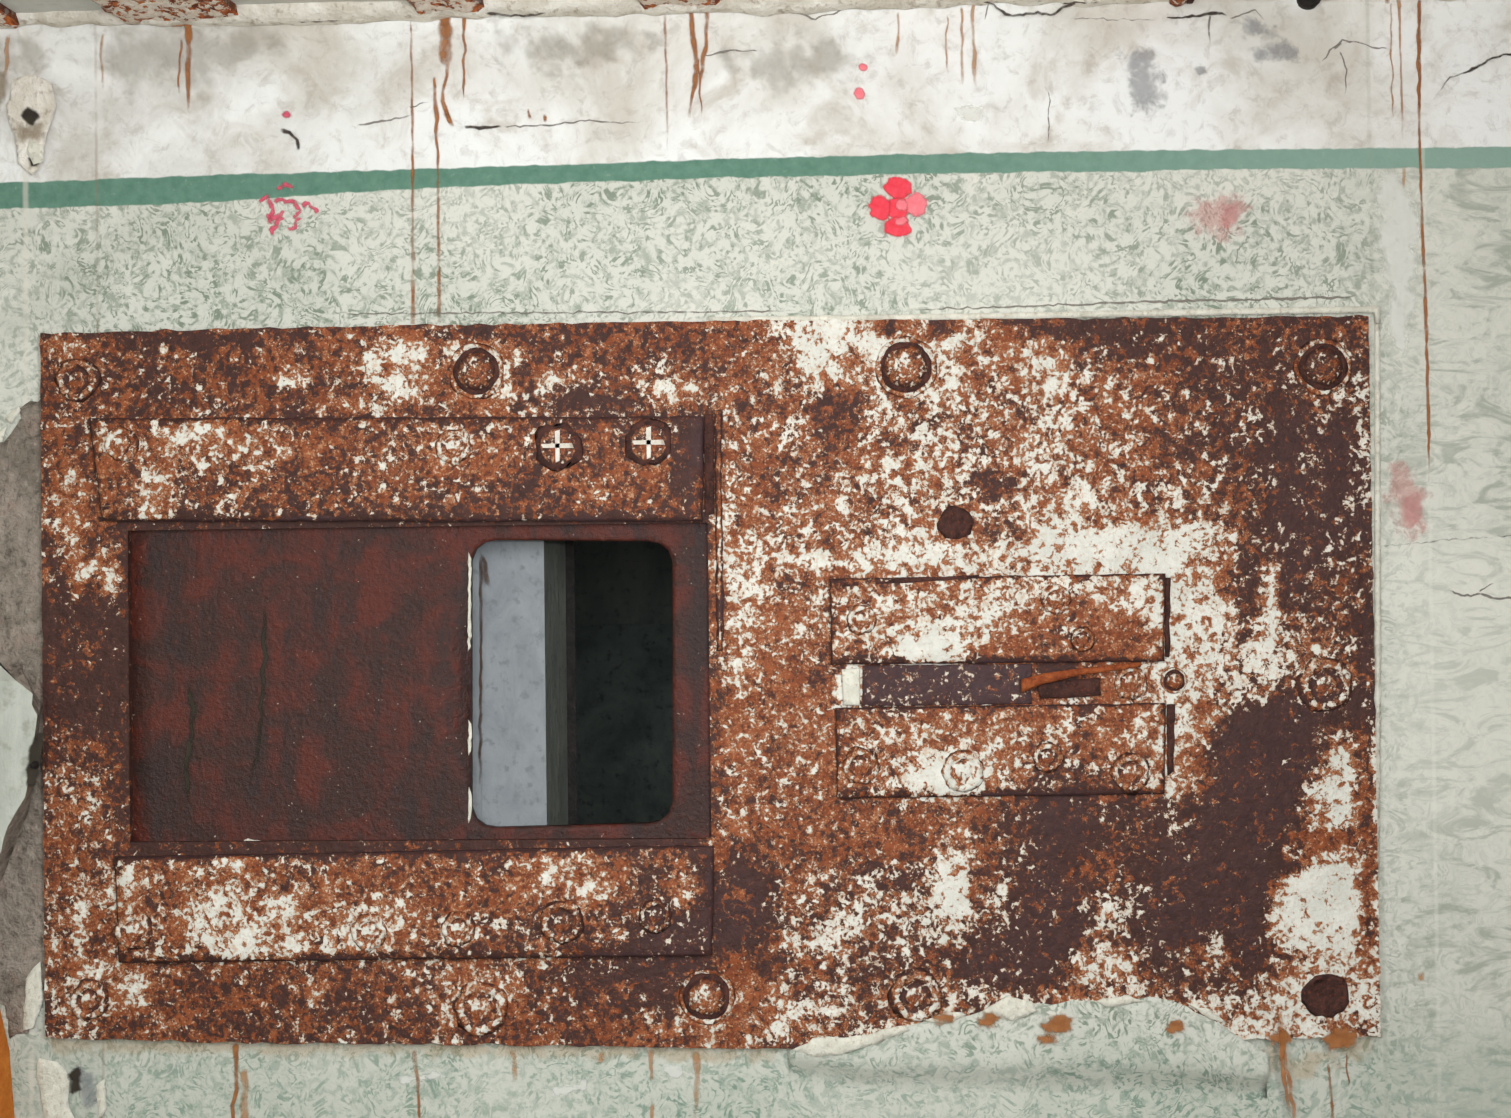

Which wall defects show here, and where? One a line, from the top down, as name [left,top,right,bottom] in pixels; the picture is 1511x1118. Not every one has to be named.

corrosion [689,13,709,110]
corrosion [945,5,977,69]
crack [984,1,1260,36]
crack [1324,39,1385,86]
crack [1446,53,1511,82]
corrosion [433,18,467,253]
corrosion [1386,0,1431,456]
crack [1452,584,1511,600]
corrosion [478,556,489,764]
spalling [0,400,46,1038]
corrosion [1037,1014,1072,1043]
flaking render [36,1058,107,1118]